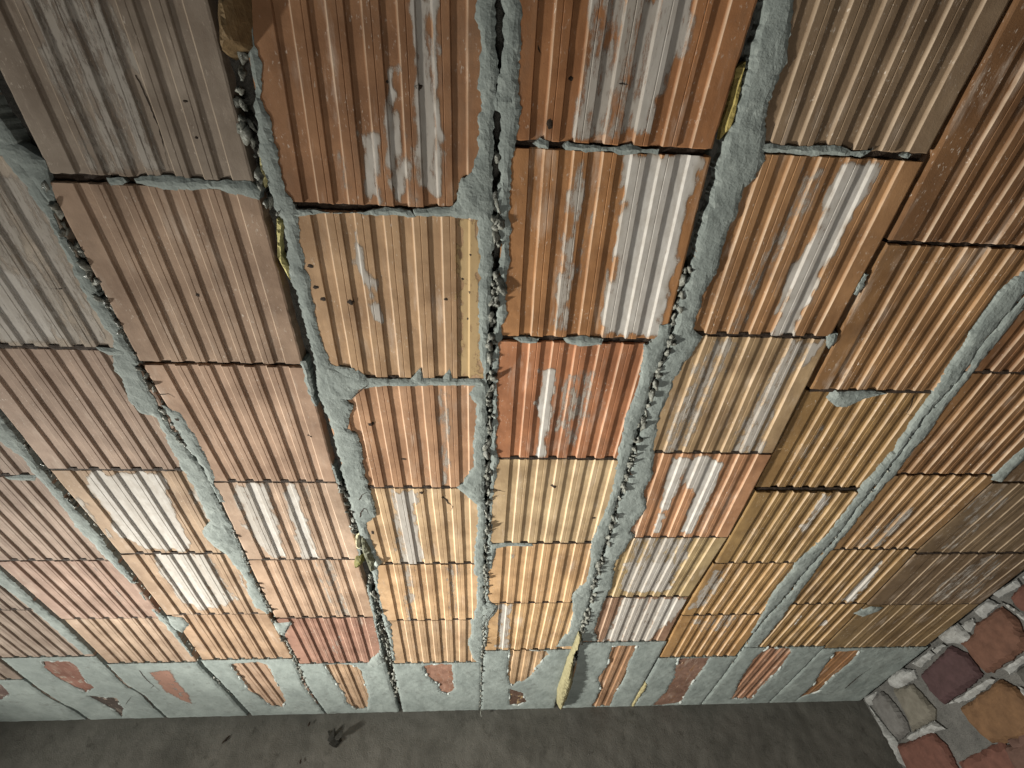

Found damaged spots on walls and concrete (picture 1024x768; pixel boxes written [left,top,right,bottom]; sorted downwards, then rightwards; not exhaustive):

crack [495,0,505,91]
crack [737,6,756,64]
crack [0,70,39,149]
efflorescence [600,153,705,339]
leakage [732,161,883,453]
crack [0,110,969,708]
leakage [602,313,749,642]
efflorescence [76,471,252,611]
spalling [40,660,124,716]
spalling [231,662,286,707]
spalling [325,664,369,710]
spalling [592,645,638,707]